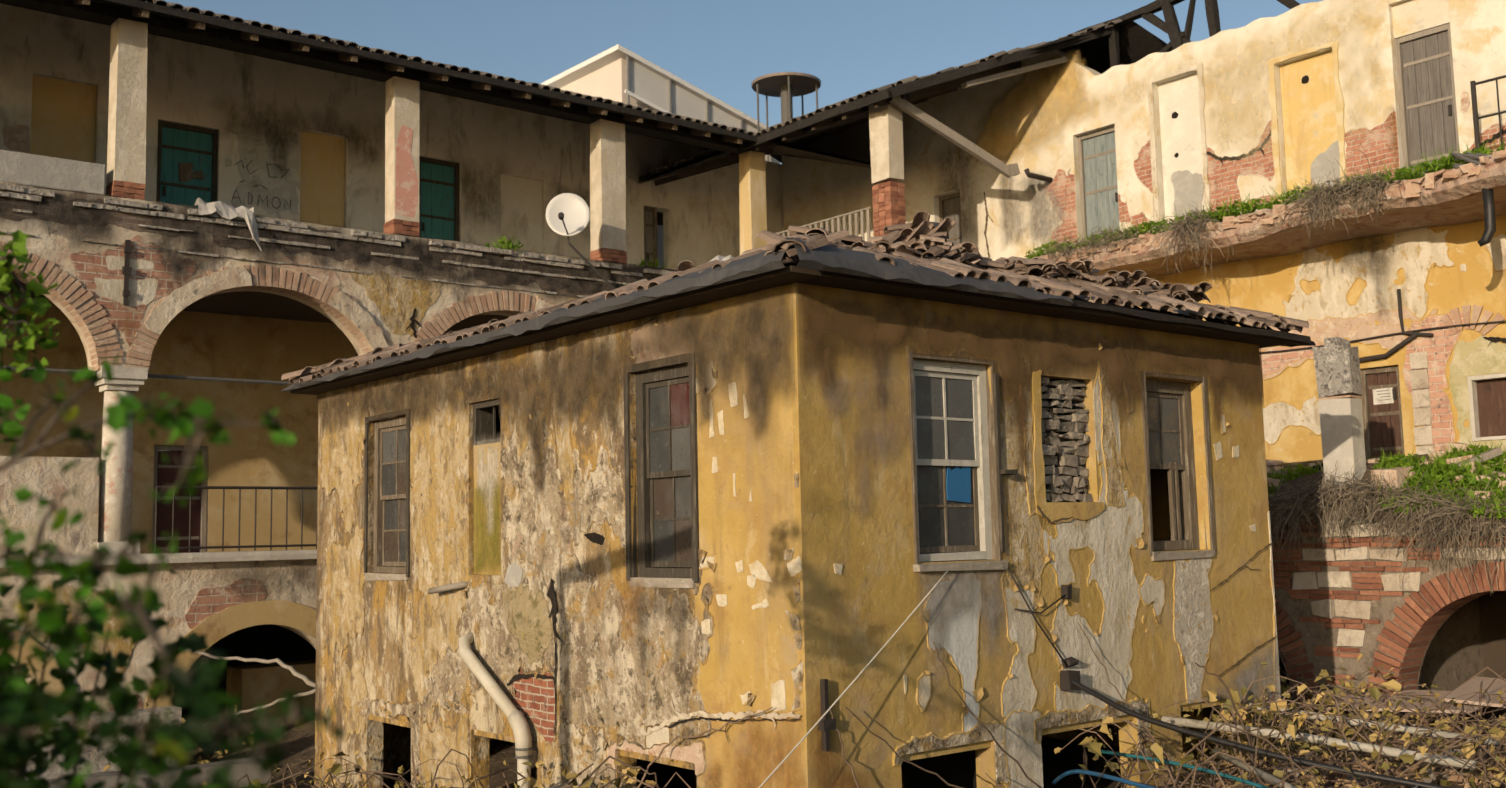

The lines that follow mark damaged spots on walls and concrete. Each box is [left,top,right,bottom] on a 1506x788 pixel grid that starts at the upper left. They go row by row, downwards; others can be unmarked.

flaking render [1,198,197,346]
flaking render [225,112,596,337]
leakage [317,289,1264,488]
flaking render [1043,168,1077,250]
flaking render [1207,119,1275,216]
flaking render [1345,110,1400,183]
flaking render [1259,227,1506,452]
leakage [475,448,501,572]
flaking render [320,381,727,788]
spalling [735,548,804,713]
flaking render [892,332,1218,788]